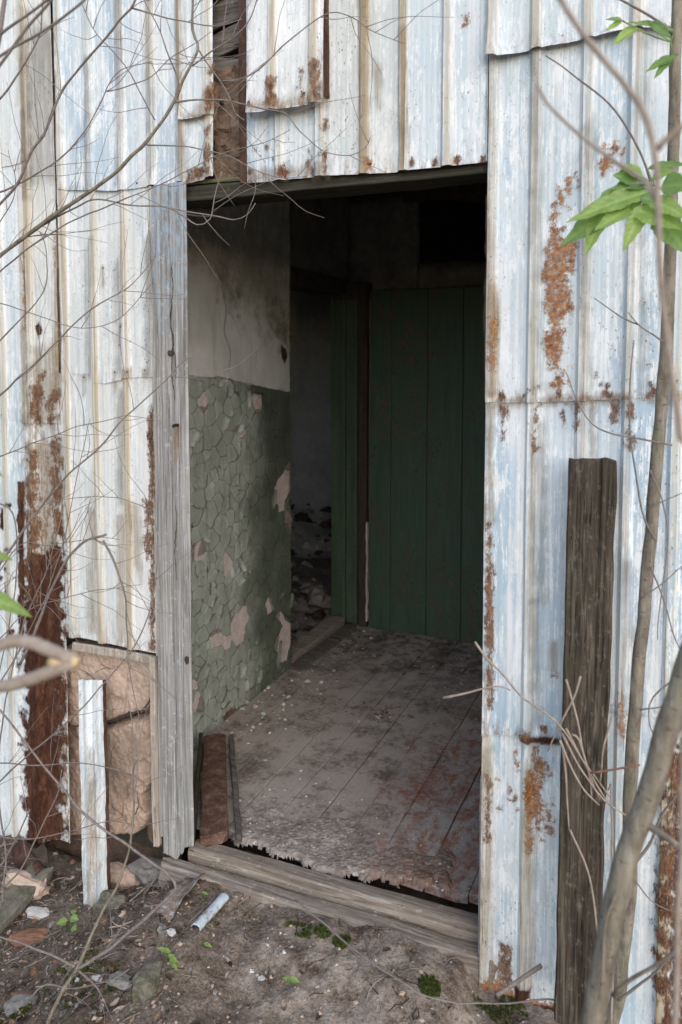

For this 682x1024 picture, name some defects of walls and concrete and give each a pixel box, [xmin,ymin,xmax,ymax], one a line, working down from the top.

rust [263,74,278,108]
rust [522,170,584,431]
rust [28,370,62,425]
rust [16,649,49,674]
rust [0,437,69,648]
rust [142,404,156,651]
peeling [188,375,294,745]
rust [484,521,496,711]
rust [17,675,75,848]
rust [480,940,554,1012]
rust [483,726,560,856]
rust [649,738,682,1024]